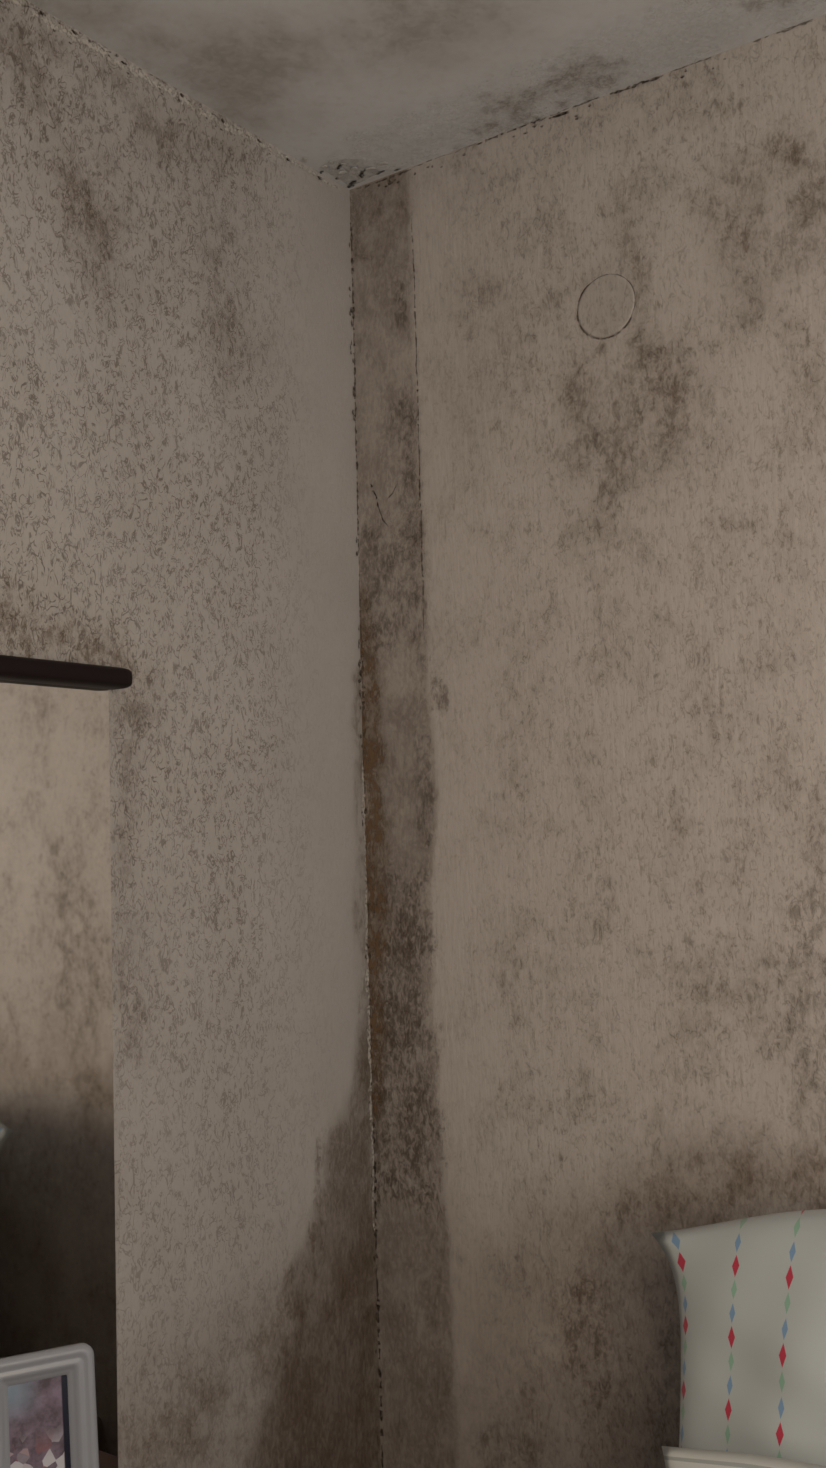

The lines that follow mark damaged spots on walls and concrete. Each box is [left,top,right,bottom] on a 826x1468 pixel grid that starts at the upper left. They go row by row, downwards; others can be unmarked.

leakage [333,598,433,1288]